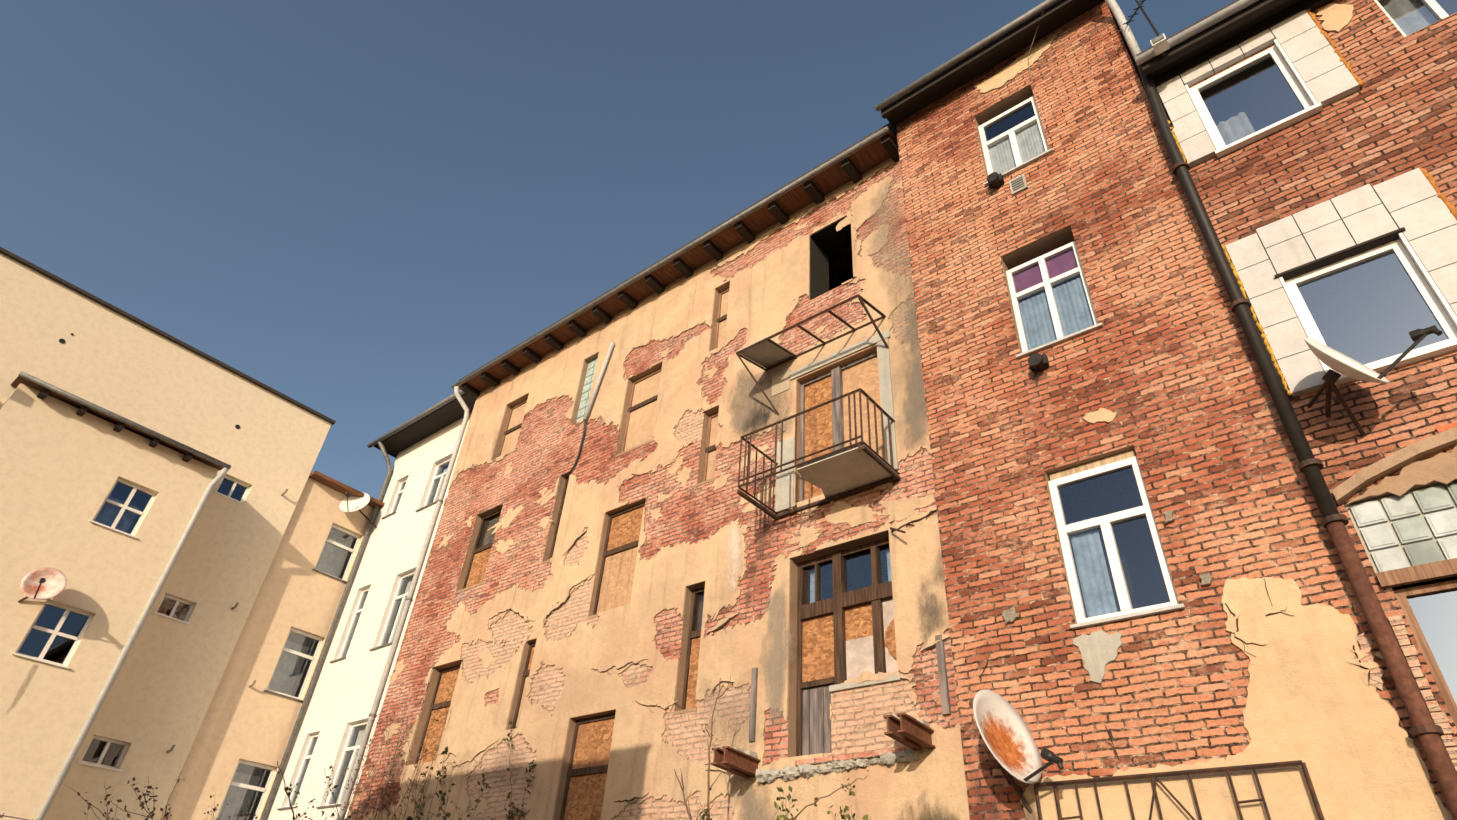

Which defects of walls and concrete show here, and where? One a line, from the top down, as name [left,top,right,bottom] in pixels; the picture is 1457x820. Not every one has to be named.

spalling [711,160,912,359]
spalling [889,299,918,345]
spalling [351,323,937,820]
crack [1225,579,1293,657]